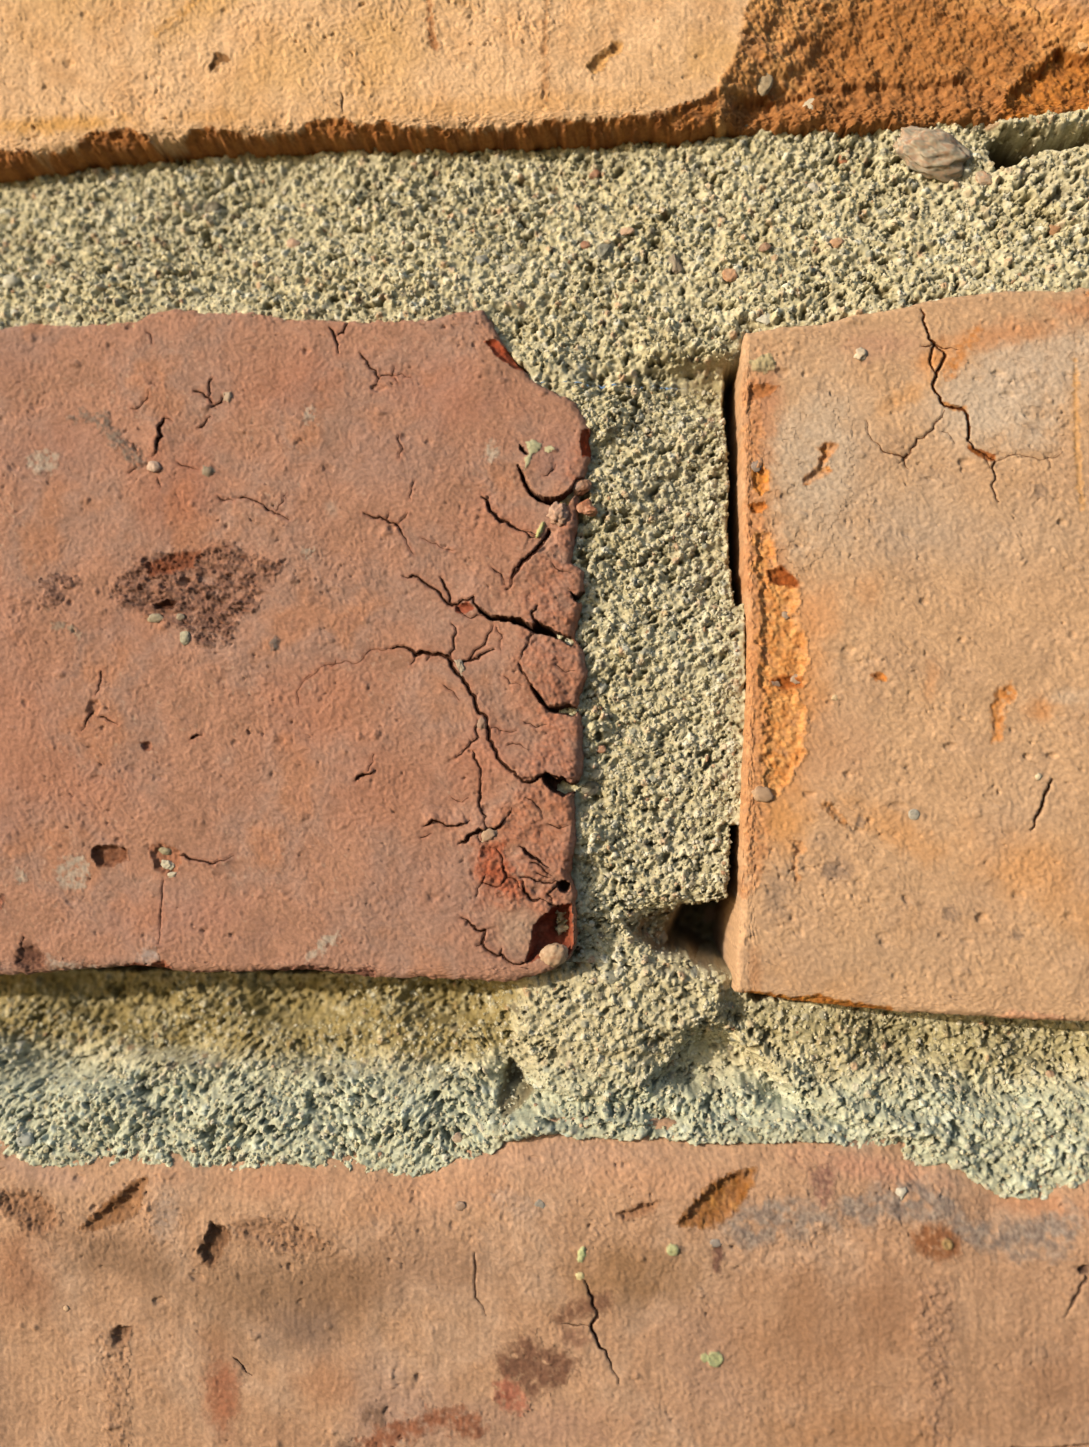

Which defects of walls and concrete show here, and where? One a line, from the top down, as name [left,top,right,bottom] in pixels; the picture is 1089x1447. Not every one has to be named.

spalling [0,0,1089,184]
crack [866,309,1063,502]
spalling [106,539,286,649]
crack [296,435,575,965]